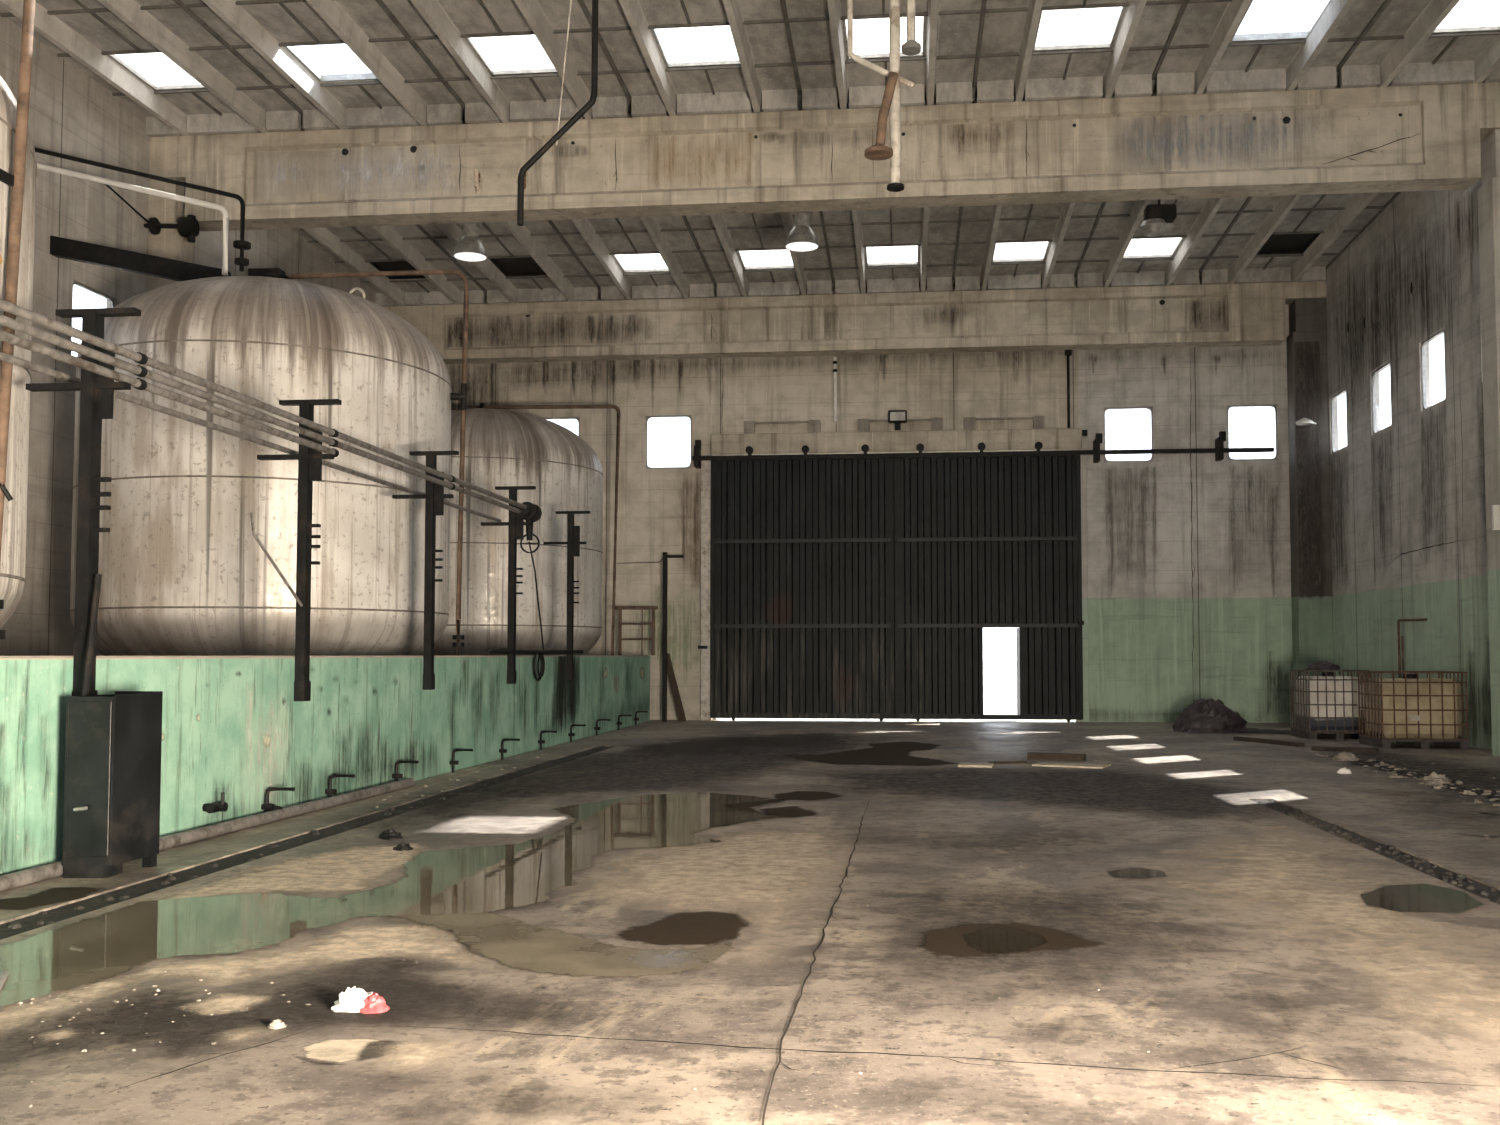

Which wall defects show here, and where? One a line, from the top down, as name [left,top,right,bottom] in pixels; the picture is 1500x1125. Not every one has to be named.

crack [351,799,1480,1125]